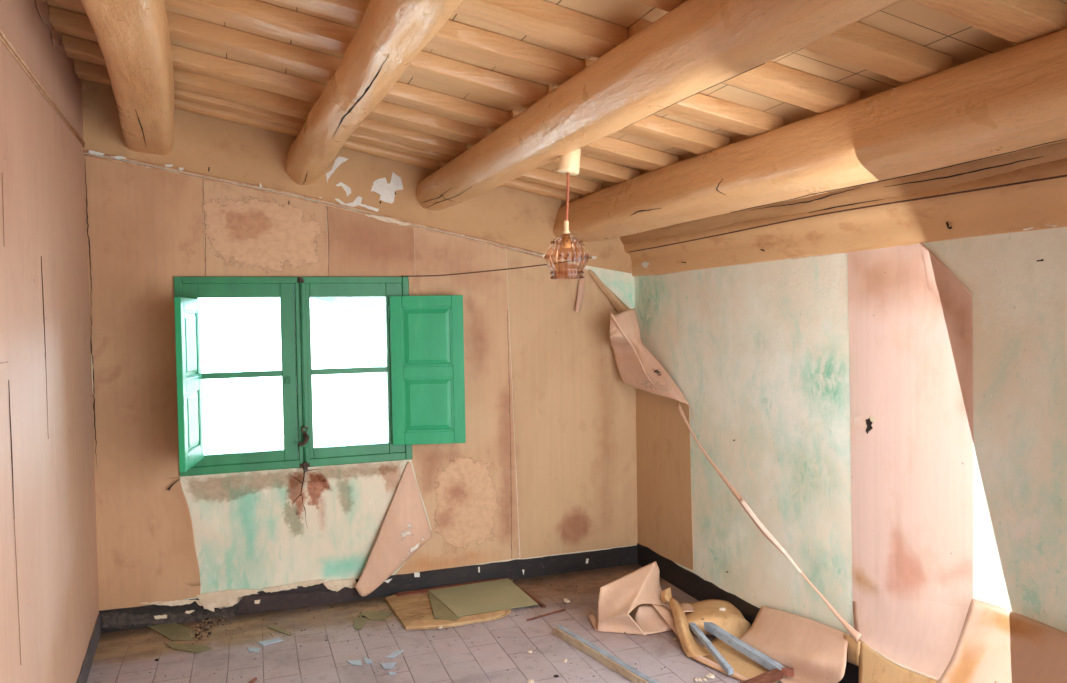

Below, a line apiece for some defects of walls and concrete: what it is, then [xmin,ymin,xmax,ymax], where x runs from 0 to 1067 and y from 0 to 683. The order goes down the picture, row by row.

crack [333,55,389,137]
peeling [326,156,412,226]
crack [716,139,1066,213]
leakage [202,196,325,273]
spalling [854,414,876,434]
leakage [433,457,498,549]
peeling [676,402,862,666]